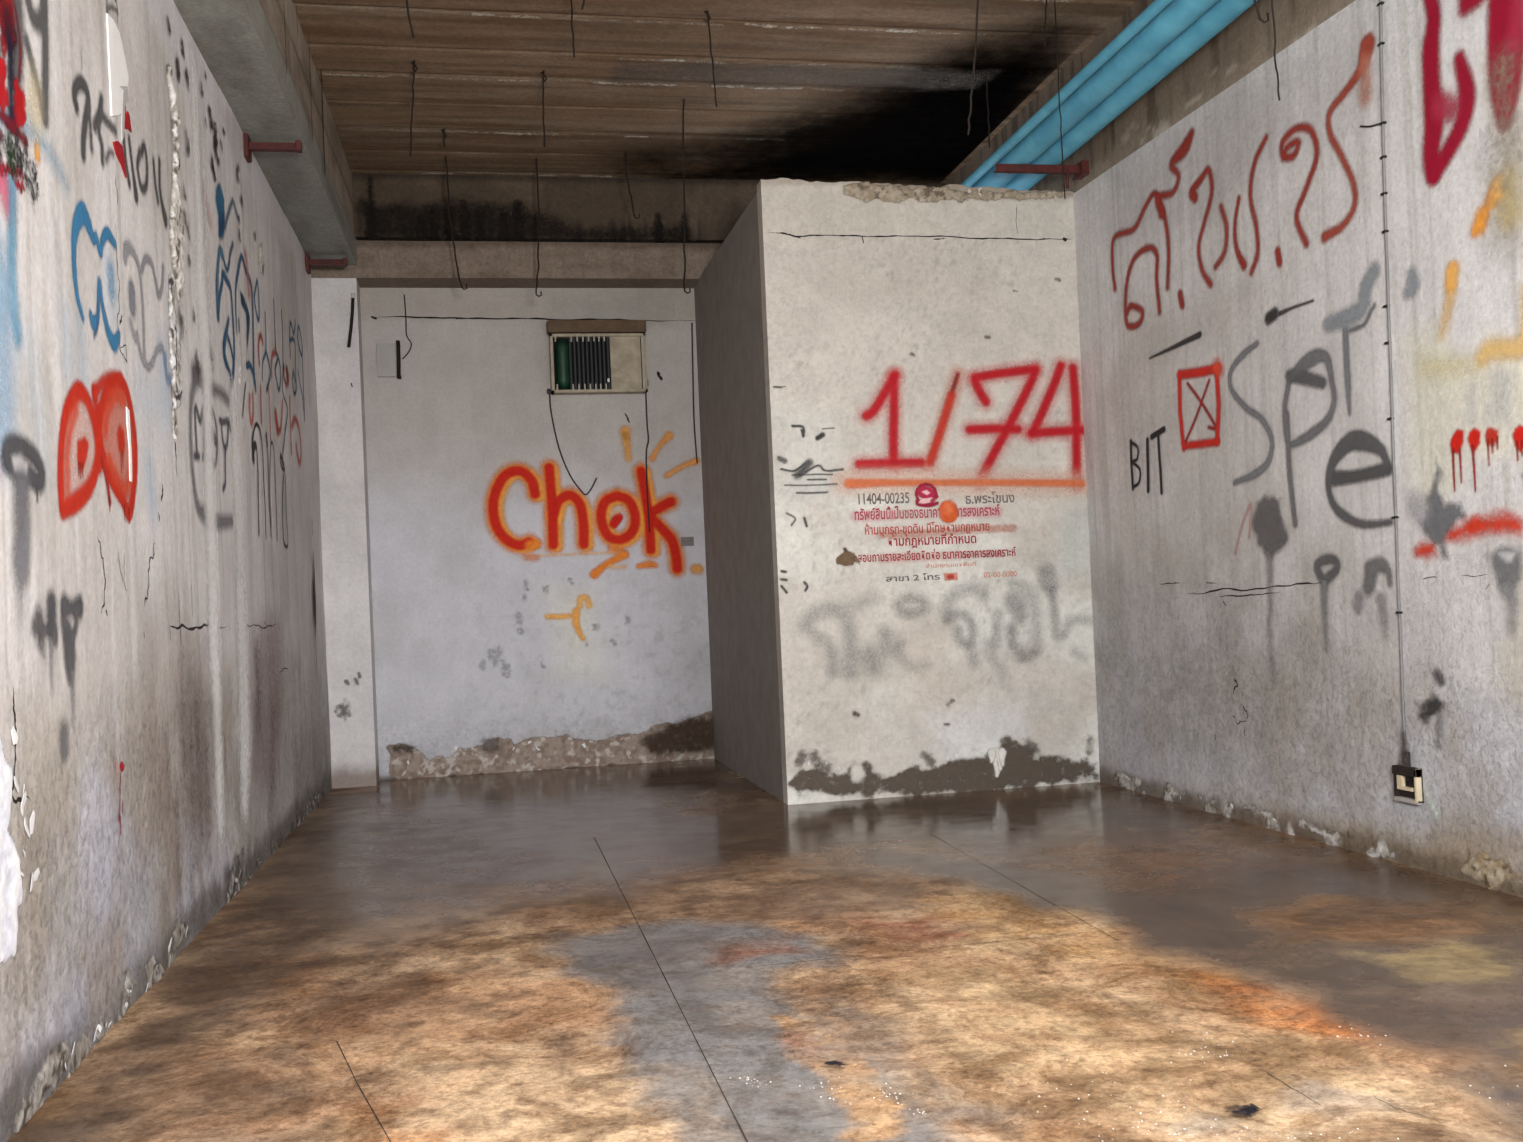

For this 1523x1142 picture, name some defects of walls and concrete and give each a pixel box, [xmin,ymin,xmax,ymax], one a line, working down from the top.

leakage [594,58,980,92]
peeling [166,66,186,472]
crack [98,485,278,638]
spalling [386,711,714,779]
spalling [226,787,325,904]
spalling [1461,852,1522,890]
spalling [15,919,188,1133]